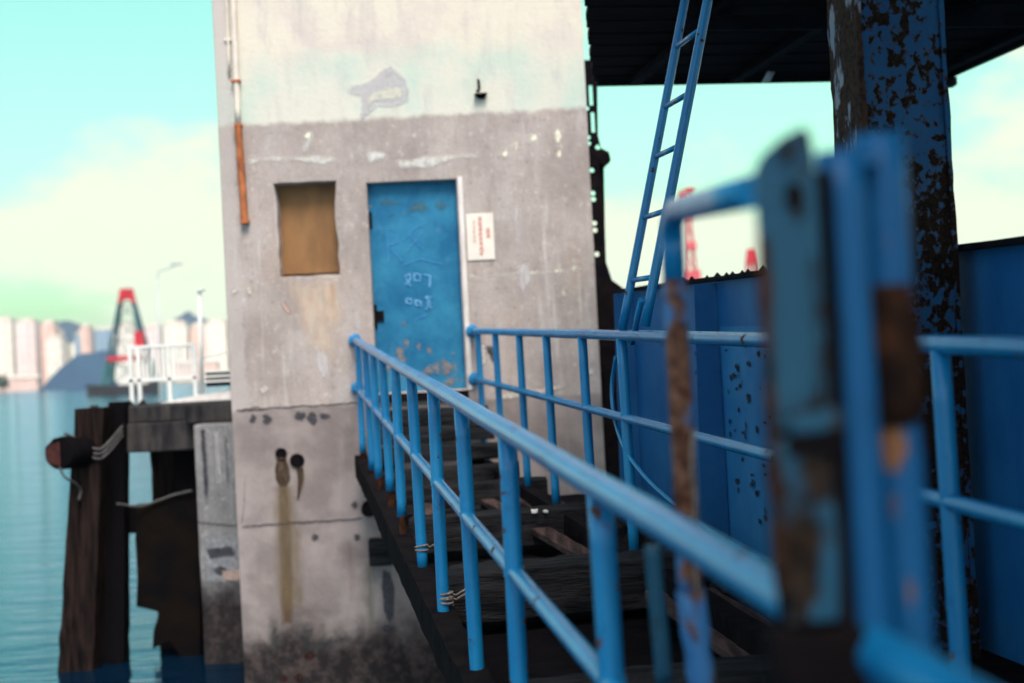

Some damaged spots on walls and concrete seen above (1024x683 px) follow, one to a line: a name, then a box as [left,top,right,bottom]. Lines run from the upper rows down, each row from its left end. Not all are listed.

peeling [349,66,409,118]
peeling [387,339,408,372]
peeling [424,348,454,386]